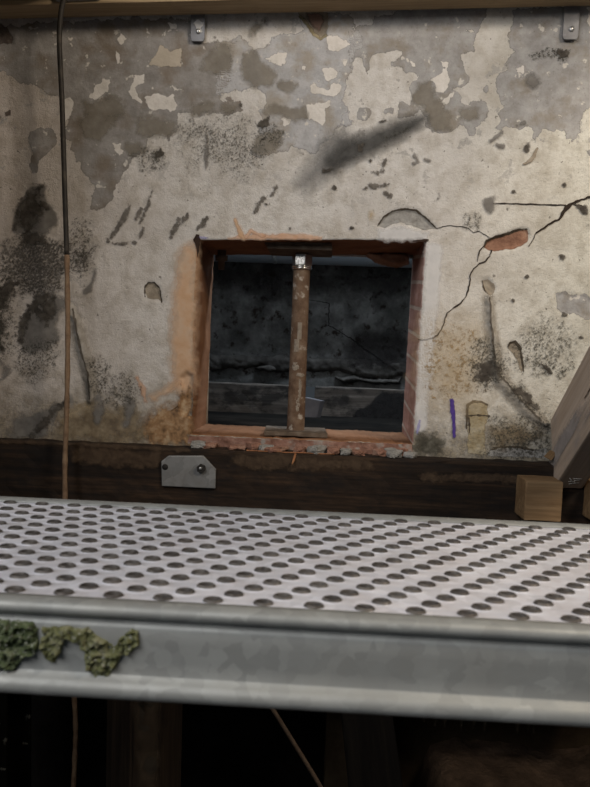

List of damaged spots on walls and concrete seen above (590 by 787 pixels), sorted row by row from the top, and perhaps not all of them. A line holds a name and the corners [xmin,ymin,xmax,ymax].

peeling [0,6,590,211]
spalling [378,208,528,251]
crack [494,196,590,246]
water stain [0,184,96,385]
spalling [144,282,162,303]
crack [418,246,492,340]
corrosion [136,246,197,445]
water stain [9,357,144,443]